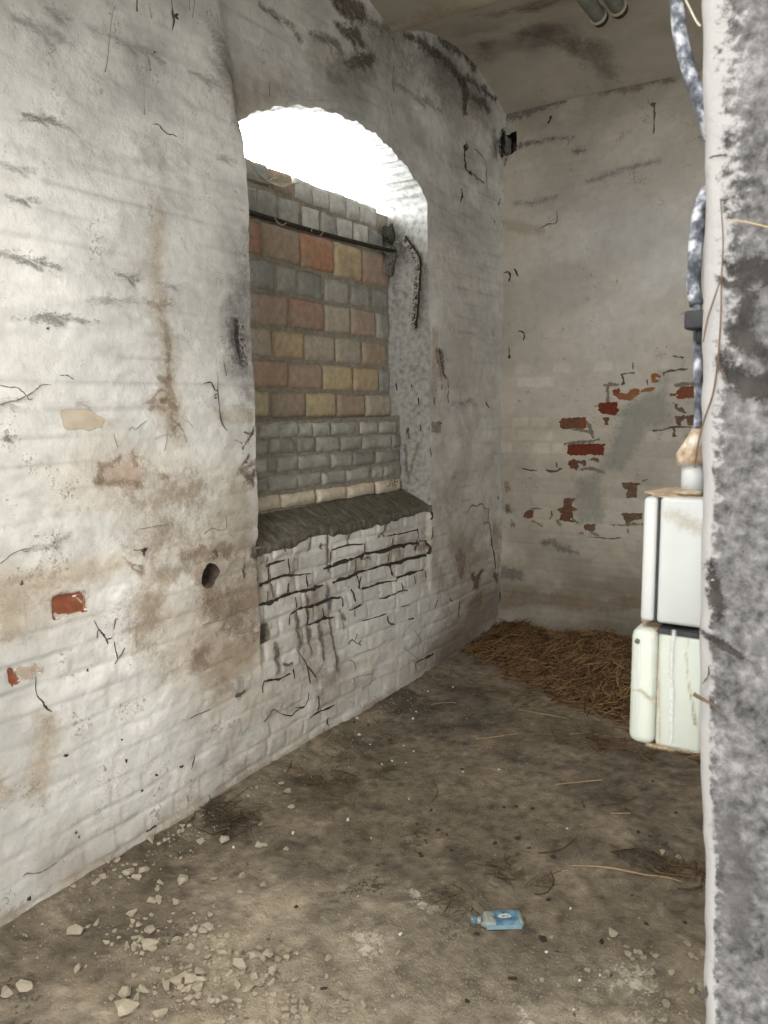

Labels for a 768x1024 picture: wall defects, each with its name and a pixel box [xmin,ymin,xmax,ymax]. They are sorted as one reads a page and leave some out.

damp [259,0,390,72]
crack [0,375,74,405]
damp [147,301,187,441]
spalling [594,373,661,425]
spalling [670,381,694,426]
damp [93,455,146,490]
damp [237,428,257,487]
spalling [558,417,605,473]
spalling [556,498,599,537]
damp [242,547,274,599]
spalling [51,590,87,620]
crack [349,630,421,689]